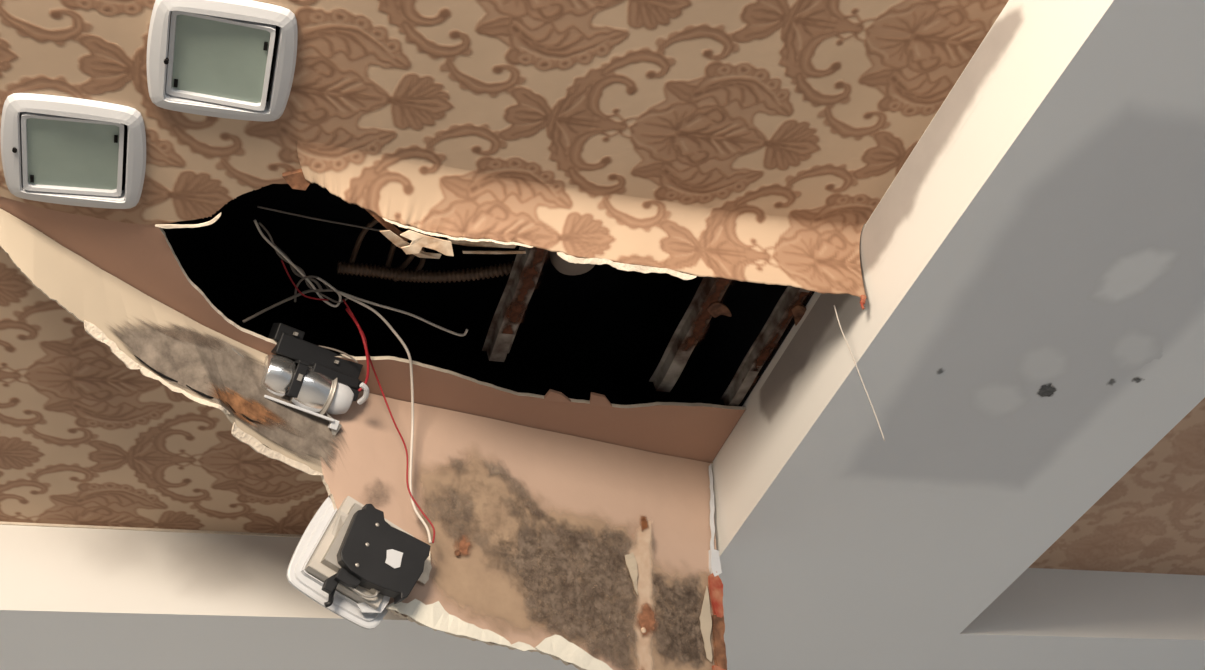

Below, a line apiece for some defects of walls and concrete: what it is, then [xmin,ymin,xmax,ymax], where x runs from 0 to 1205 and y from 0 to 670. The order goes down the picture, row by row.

peeling [282,169,310,190]
peeling [0,208,323,476]
corrosion [501,247,548,335]
corrosion [682,278,733,351]
corrosion [743,291,811,388]
water stain [112,320,341,467]
peeling [543,389,572,403]
peeling [590,392,612,407]
peeling [418,553,432,584]
peeling [385,599,613,670]
water stain [420,456,713,670]
corrosion [708,549,727,670]